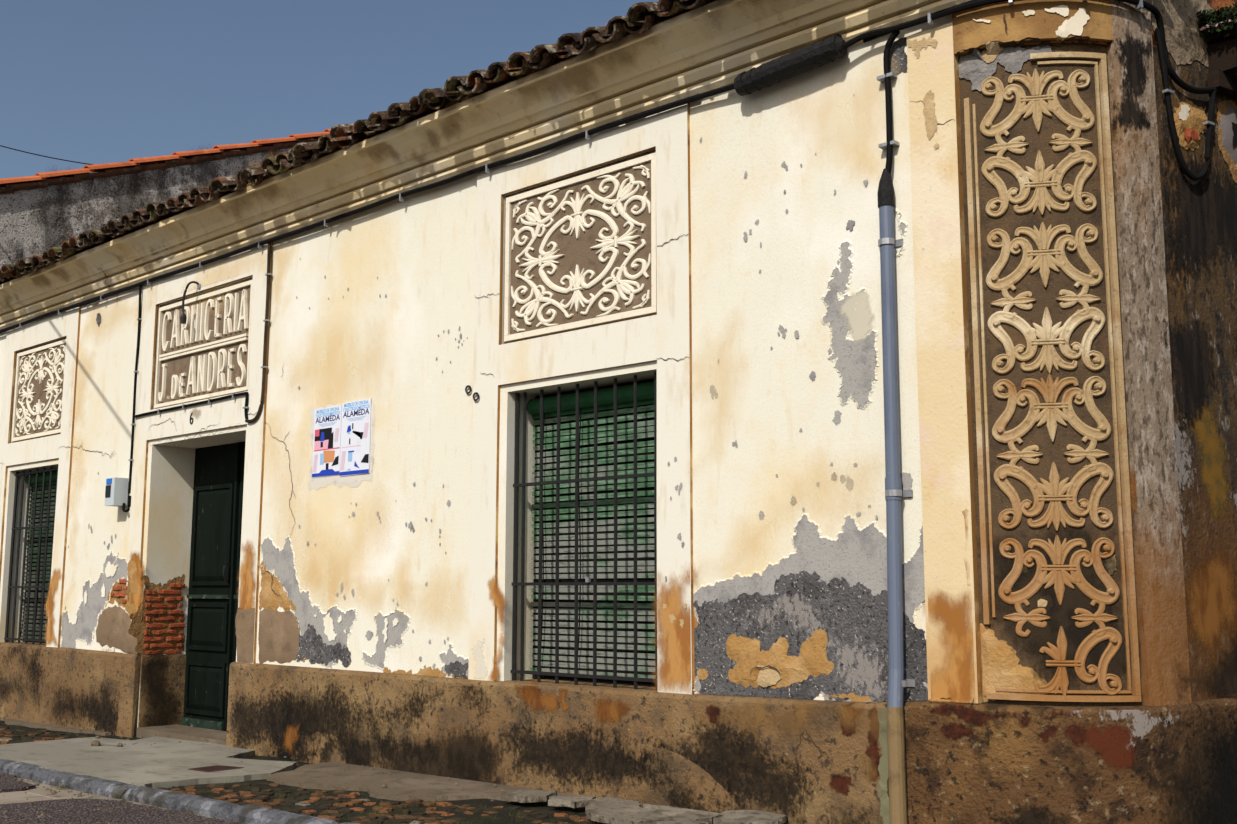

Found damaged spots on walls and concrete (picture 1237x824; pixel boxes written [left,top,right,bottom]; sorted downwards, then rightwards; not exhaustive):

spalling [957,5,1090,91]
crack [957,13,1105,56]
damp [1110,34,1156,133]
peeling [820,220,880,425]
damp [1164,318,1222,453]
damp [0,570,60,703]
spalling [61,534,185,655]
damp [138,653,180,727]
peeling [259,525,469,679]
damp [230,684,813,815]
peeling [693,496,889,702]
peeling [902,523,929,701]